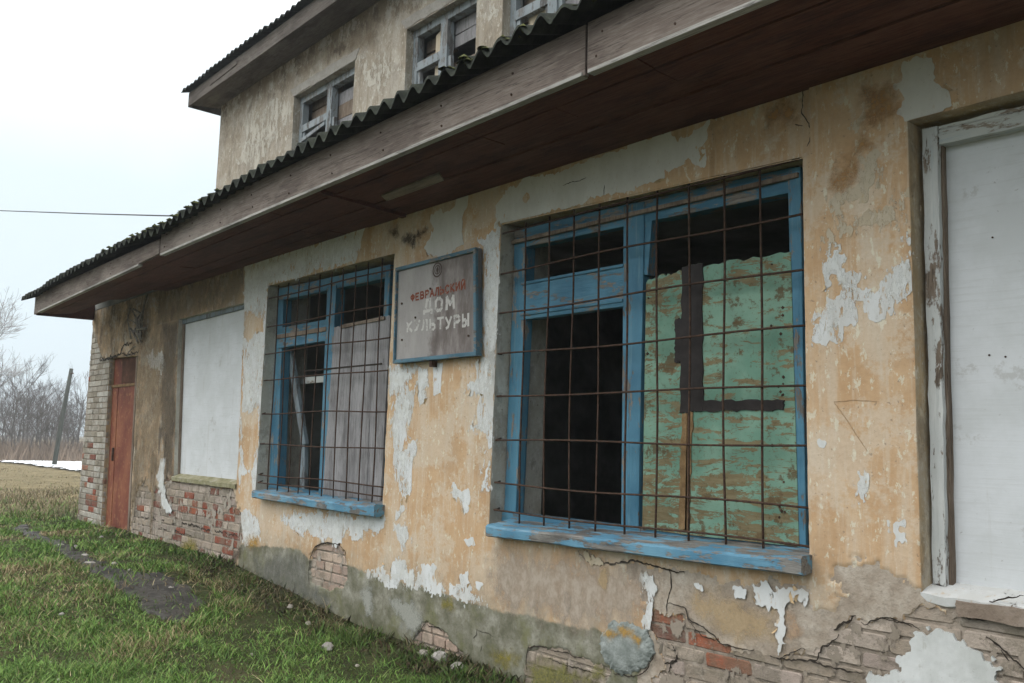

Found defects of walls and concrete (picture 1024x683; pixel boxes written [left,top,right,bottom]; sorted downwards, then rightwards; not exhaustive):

peeling [893,54,953,122]
peeling [811,149,914,347]
peeling [424,120,710,515]
flaking render [131,228,365,561]
peeling [281,362,488,608]
water stain [360,588,373,614]
water stain [390,599,422,632]
water stain [489,553,641,623]
flaking render [524,646,611,683]
crack [578,551,920,674]
flaking render [622,556,1024,683]
crack [966,595,1024,669]